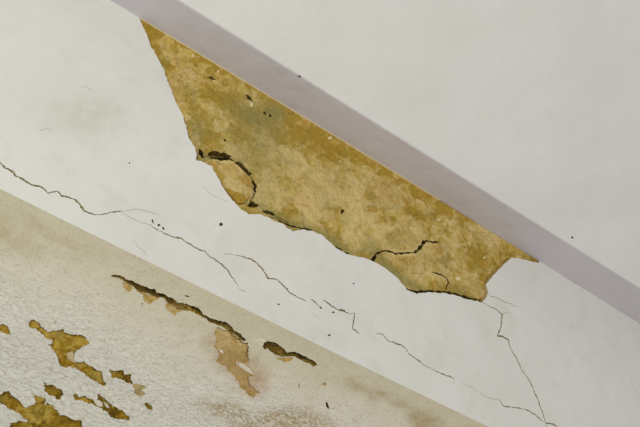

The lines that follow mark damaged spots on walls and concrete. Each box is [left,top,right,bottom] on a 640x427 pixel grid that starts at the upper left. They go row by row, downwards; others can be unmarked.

spalling [139,18,539,302]
crack [0,162,359,334]
peeling [0,382,82,427]
peeling [29,320,153,410]
peeling [73,393,130,420]
peeling [111,275,317,398]
crack [376,295,557,427]